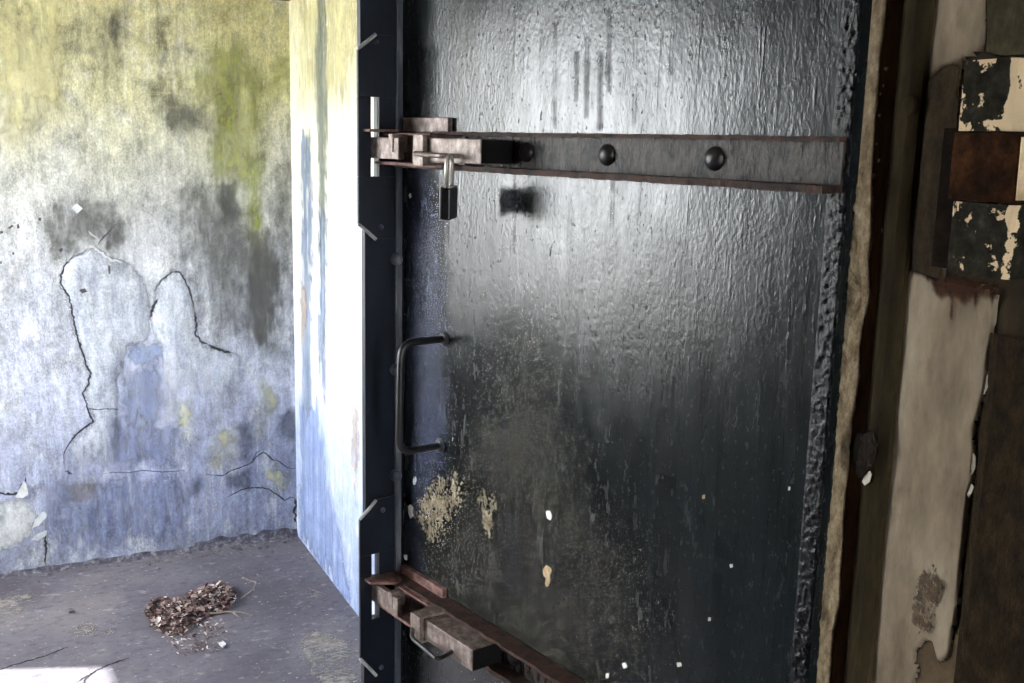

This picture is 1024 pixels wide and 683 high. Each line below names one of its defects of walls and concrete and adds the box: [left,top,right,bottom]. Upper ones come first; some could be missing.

water stain [48,204,120,260]
crack [60,224,124,475]
crack [149,271,231,353]
corrosion [932,277,998,319]
crack [101,450,297,522]
spalling [0,478,298,579]